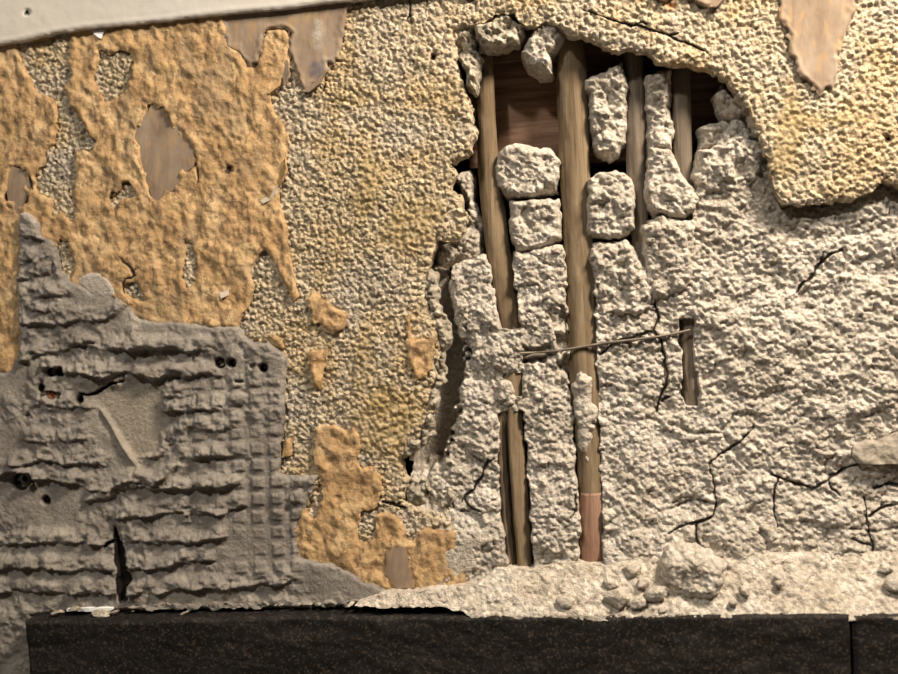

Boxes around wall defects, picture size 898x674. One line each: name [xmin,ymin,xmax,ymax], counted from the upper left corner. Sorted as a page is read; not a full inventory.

spalling [454,15,527,98]
crack [584,10,707,53]
peeling [694,0,723,9]
peeling [777,0,858,96]
peeling [0,3,352,373]
crack [797,250,842,292]
peeling [308,349,330,389]
spalling [400,268,453,459]
crack [601,301,669,412]
crack [668,427,754,545]
crack [772,463,858,526]
crack [854,482,898,551]